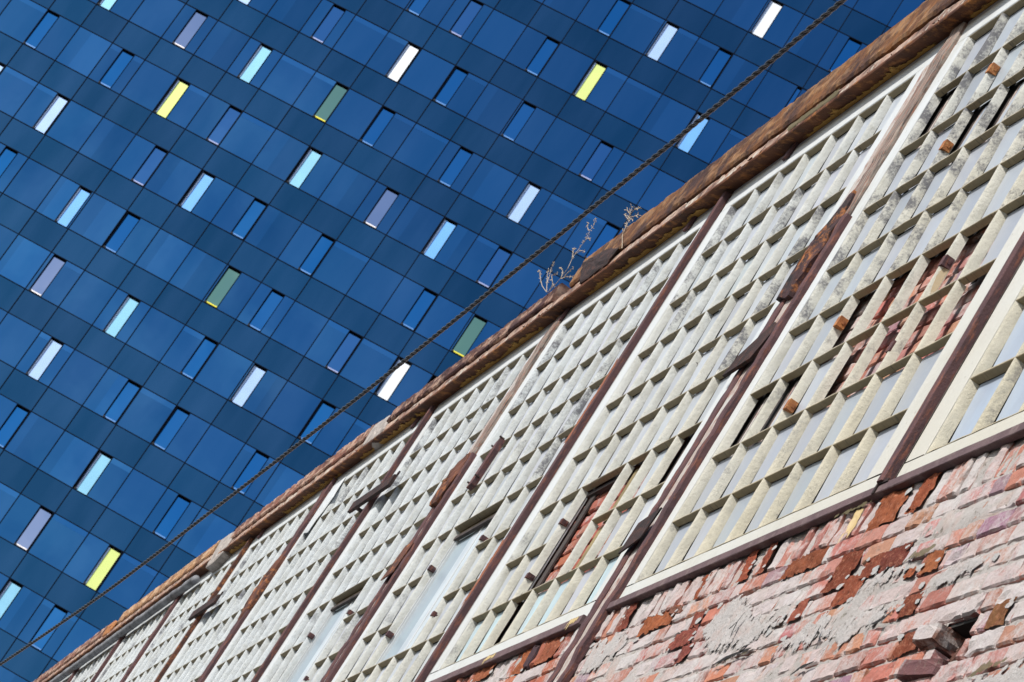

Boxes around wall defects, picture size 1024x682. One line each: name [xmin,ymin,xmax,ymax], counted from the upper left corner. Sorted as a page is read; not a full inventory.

corrosion [776,190,857,302]
corrosion [429,453,470,508]
spalling [866,472,943,532]
flaking render [579,541,1000,678]
spalling [948,596,1018,639]
flaking render [966,652,1024,682]